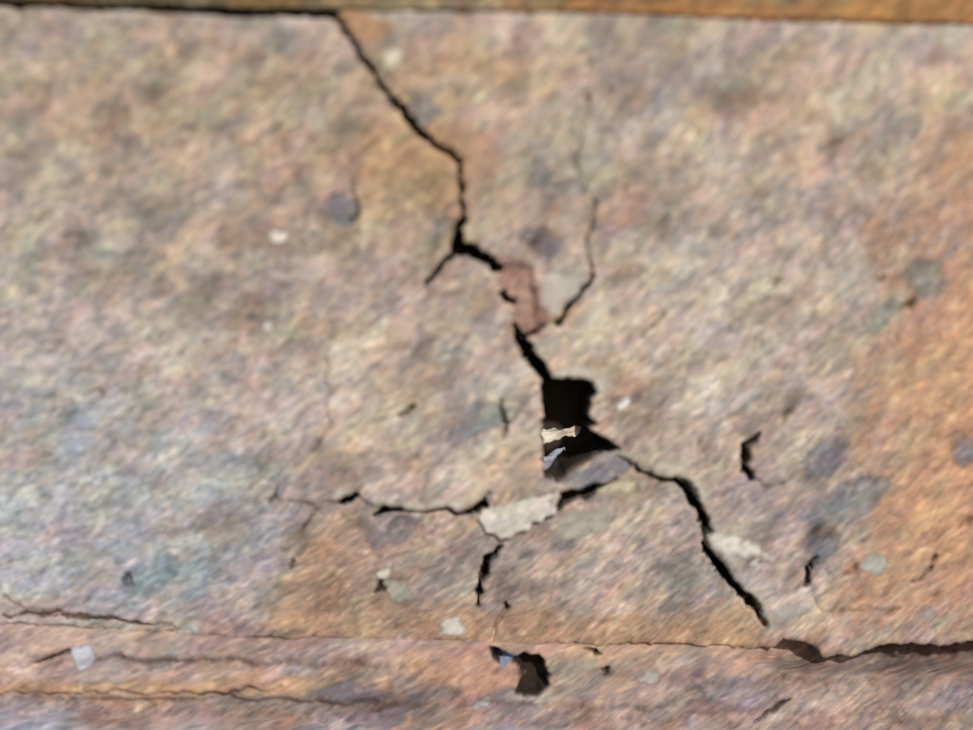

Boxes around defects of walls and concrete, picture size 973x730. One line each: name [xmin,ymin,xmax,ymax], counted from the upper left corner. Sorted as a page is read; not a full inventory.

crack [334,18,596,389]
crack [500,400,509,437]
crack [740,432,759,479]
crack [340,492,360,503]
crack [374,492,489,515]
crack [548,482,600,517]
crack [618,456,766,625]
crack [475,545,501,606]
peeling [490,646,609,698]